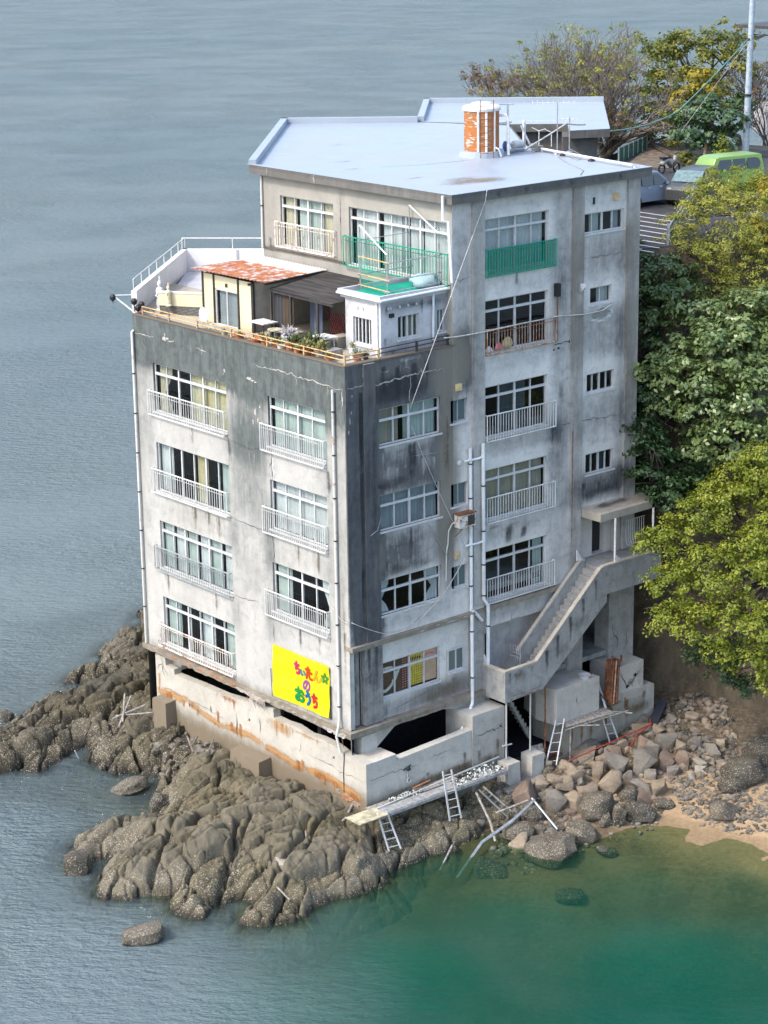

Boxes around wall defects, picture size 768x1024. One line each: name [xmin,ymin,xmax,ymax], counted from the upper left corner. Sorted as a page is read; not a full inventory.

crack [253,363,444,411]
corrosion [159,682,361,801]